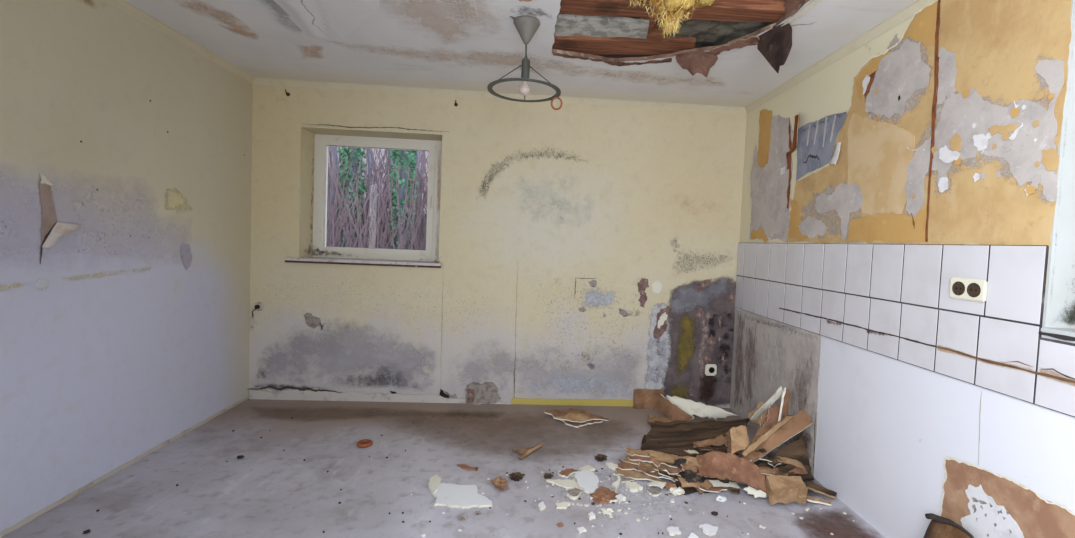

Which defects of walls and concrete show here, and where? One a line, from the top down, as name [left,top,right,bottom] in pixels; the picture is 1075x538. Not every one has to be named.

spalling [552,0,821,78]
peeling [748,0,1072,247]
water stain [248,327,425,393]
spalling [574,278,671,390]
water stain [662,240,821,496]
crack [1039,332,1075,341]
water stain [799,512,874,538]